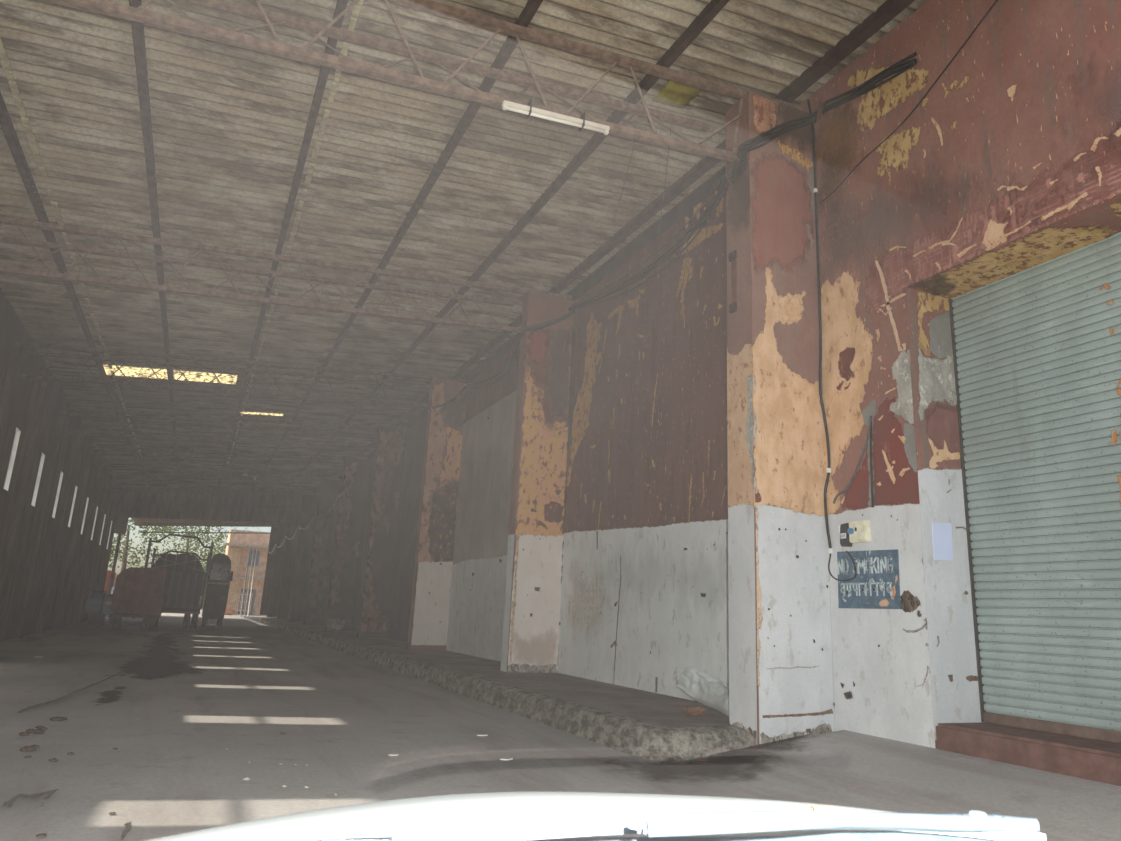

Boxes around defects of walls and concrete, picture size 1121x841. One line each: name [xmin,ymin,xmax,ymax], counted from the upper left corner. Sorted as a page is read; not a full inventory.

peeling [753,94,815,251]
peeling [847,65,970,185]
peeling [1073,128,1121,161]
peeling [676,191,724,314]
peeling [889,166,1121,358]
peeling [418,383,462,565]
peeling [515,289,645,550]
peeling [727,267,886,517]
peeling [877,450,910,486]
peeling [928,438,960,469]
damp [94,634,203,703]